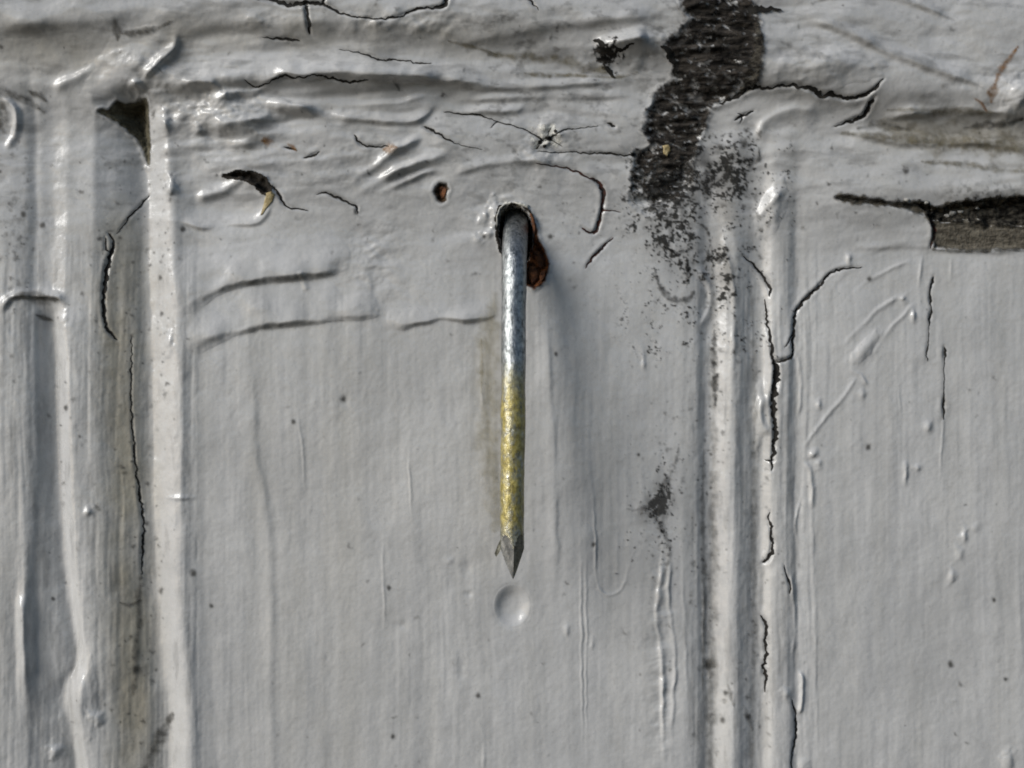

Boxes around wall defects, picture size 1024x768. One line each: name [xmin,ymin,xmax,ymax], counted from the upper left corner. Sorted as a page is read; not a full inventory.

crack [263,0,448,41]
peeling [593,36,634,78]
peeling [630,0,782,210]
peeling [222,170,275,215]
crack [424,111,634,268]
corrosion [527,213,549,289]
peeling [834,194,1024,252]
crack [101,195,150,574]
crack [743,256,861,470]
crack [926,276,946,420]
crack [762,512,791,594]
crack [760,615,769,692]